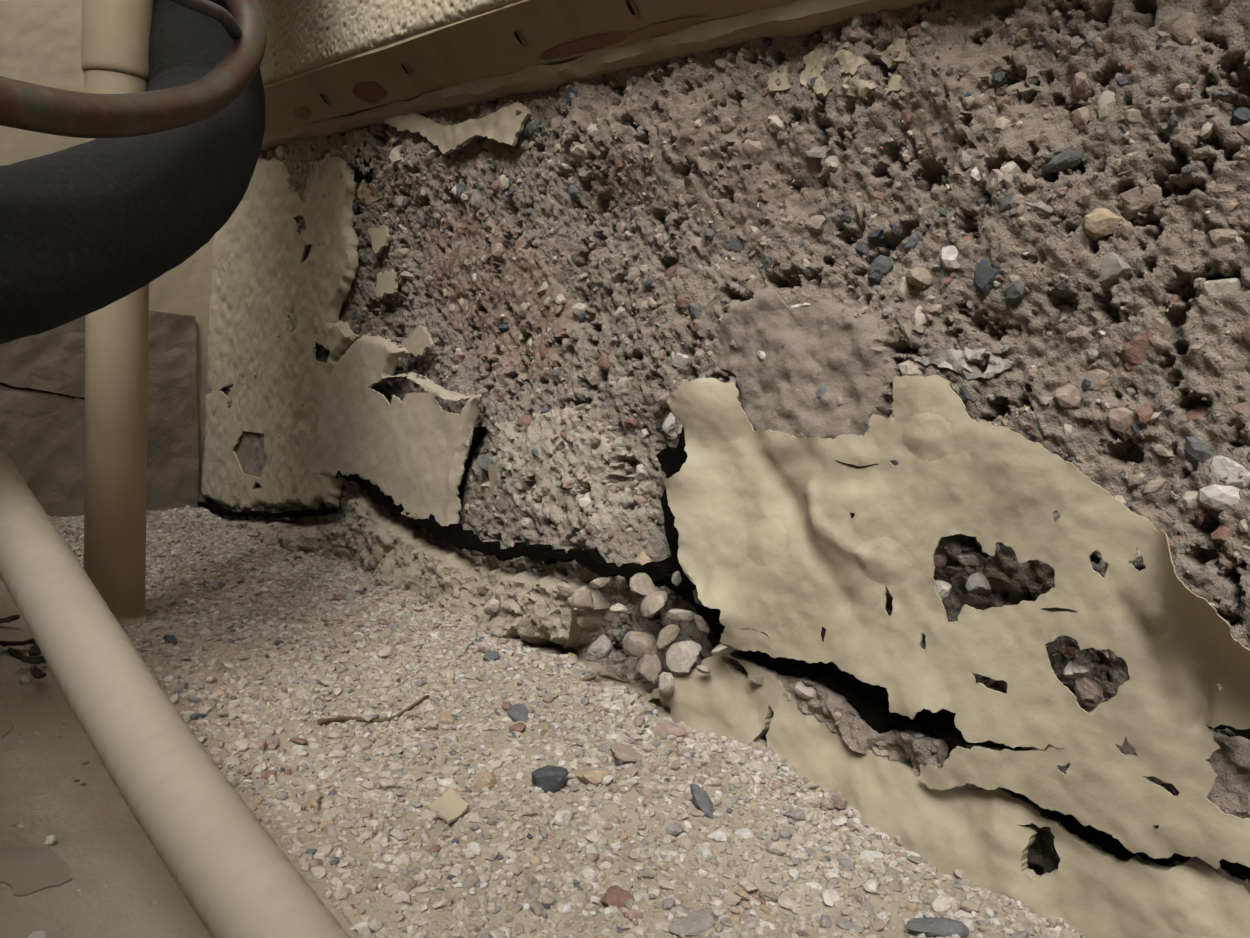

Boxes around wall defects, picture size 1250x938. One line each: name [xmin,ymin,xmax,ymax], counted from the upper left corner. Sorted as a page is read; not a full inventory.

spalling [206,367,238,417]
spalling [235,431,267,488]
spalling [258,0,1250,883]
spalling [212,480,368,525]
crack [1208,724,1250,740]
crack [1003,788,1250,879]